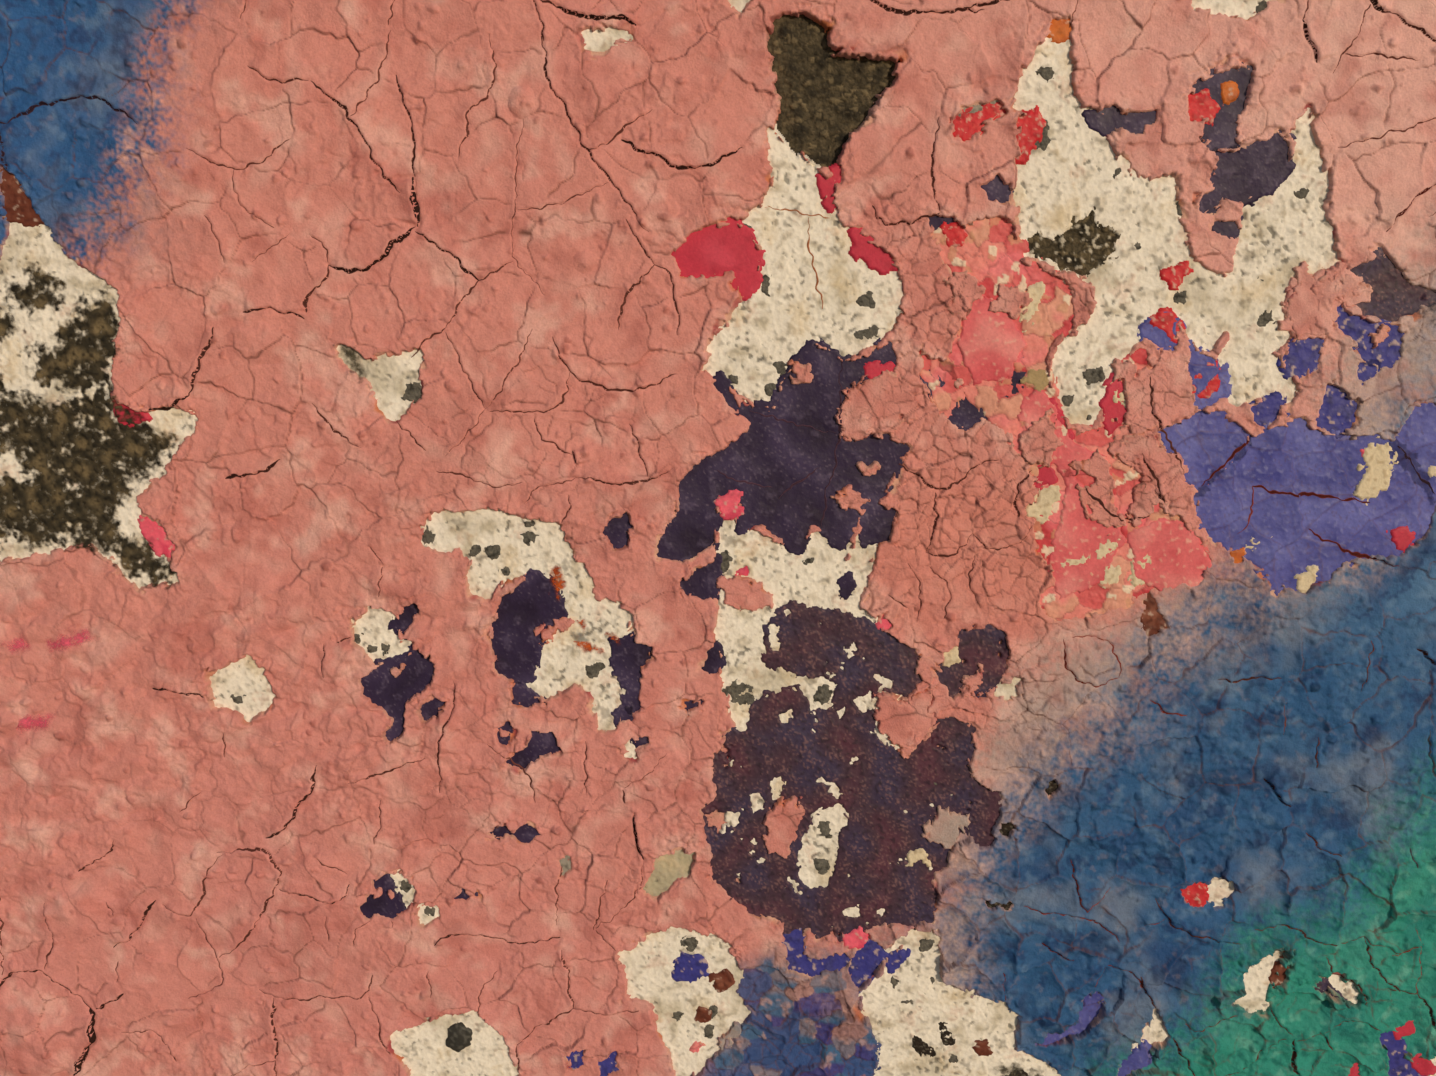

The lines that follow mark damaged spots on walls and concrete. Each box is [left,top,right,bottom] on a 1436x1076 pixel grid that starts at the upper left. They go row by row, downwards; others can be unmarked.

crack [870,0,1009,16]
crack [1303,0,1436,73]
crack [148,0,742,523]
peeling [0,167,198,589]
peeling [351,603,445,741]
peeling [420,508,652,732]
crack [889,460,1032,619]
peeling [643,14,1436,1076]
crack [1085,376,1395,567]
crack [0,683,456,1076]
peeling [390,1010,519,1076]
peeling [618,926,751,1076]